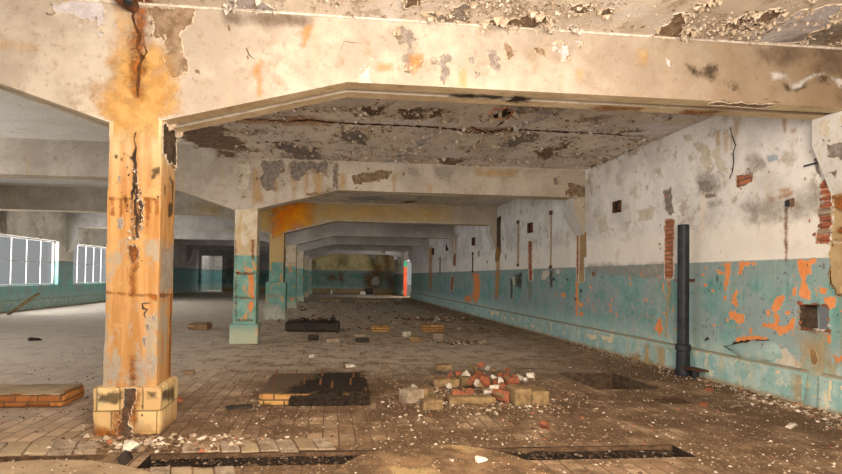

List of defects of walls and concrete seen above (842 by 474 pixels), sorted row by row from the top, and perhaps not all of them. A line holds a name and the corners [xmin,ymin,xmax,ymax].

rust [130,8,146,96]
crack [130,13,148,97]
peeling [138,0,200,79]
peeling [356,59,374,83]
peeling [390,0,842,85]
crack [131,132,143,238]
crack [241,112,644,137]
peeling [207,97,700,208]
peeling [682,134,757,201]
flaking render [636,186,683,291]
spalling [701,115,842,383]
spalling [110,387,143,436]